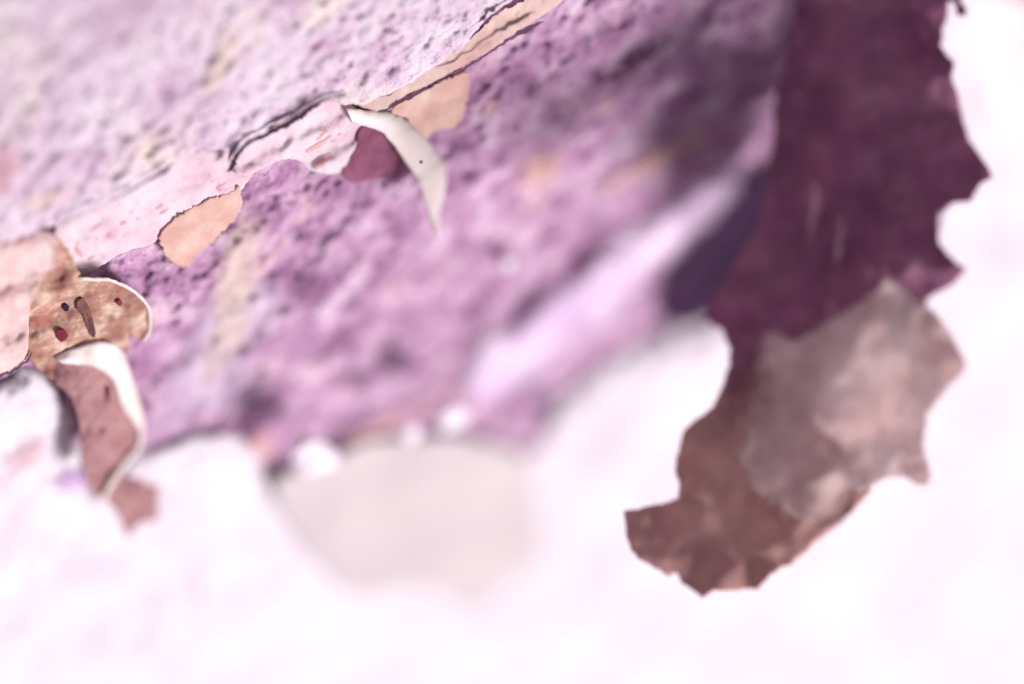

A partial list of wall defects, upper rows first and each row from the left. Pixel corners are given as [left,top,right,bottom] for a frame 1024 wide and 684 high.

peeling [0,0,563,538]
peeling [624,0,993,598]